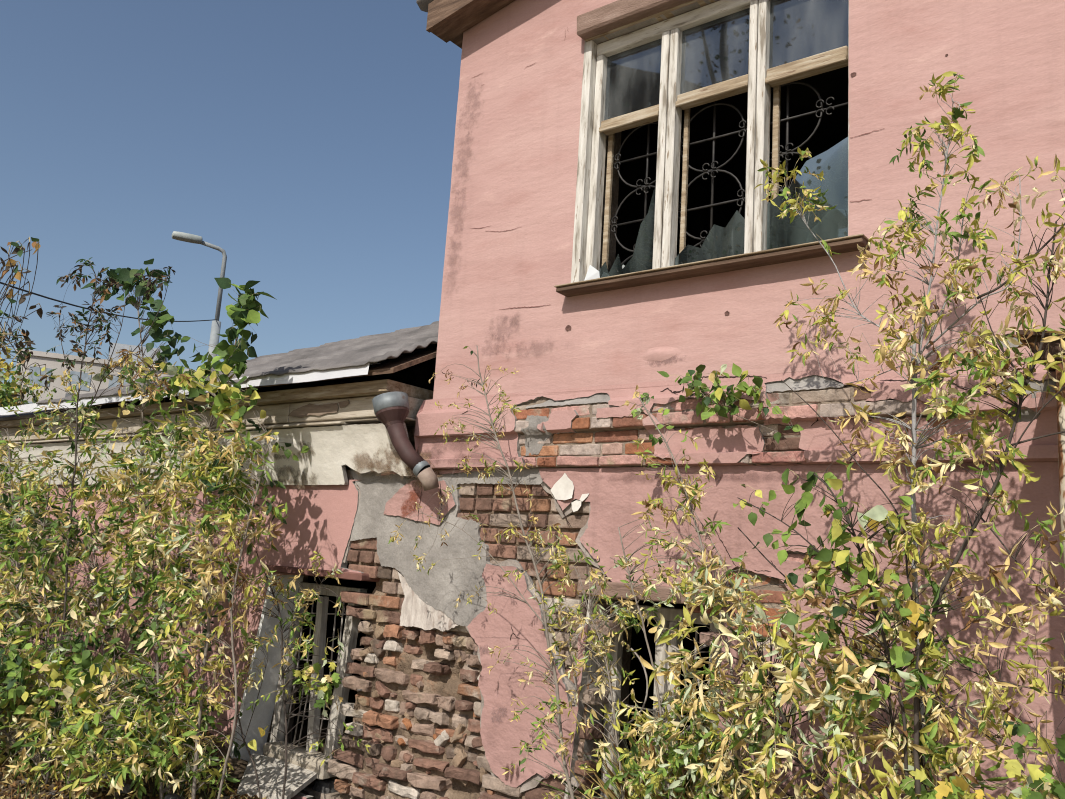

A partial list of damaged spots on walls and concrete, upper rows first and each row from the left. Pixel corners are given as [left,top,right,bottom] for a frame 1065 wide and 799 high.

spalling [327,375,947,799]